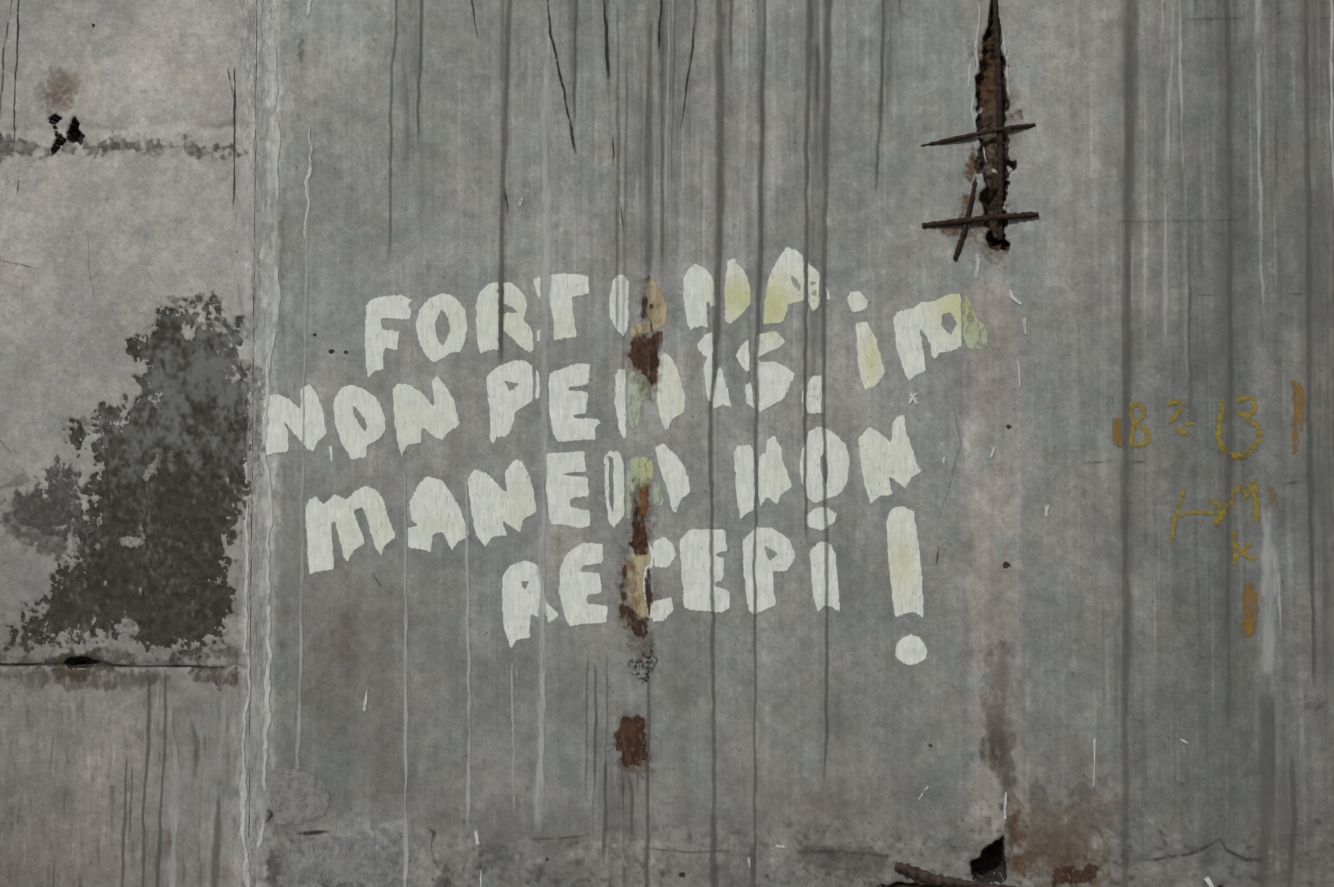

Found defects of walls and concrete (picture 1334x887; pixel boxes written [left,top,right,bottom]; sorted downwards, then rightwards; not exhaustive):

spalling [48,113,85,156]
crack [547,0,575,149]
crack [602,0,610,72]
corrosion [921,0,1038,260]
spalling [968,4,1014,174]
corrosion [628,276,662,384]
water stain [709,0,732,720]
water stain [803,0,831,548]
water stain [169,264,420,887]
corrosion [619,479,652,639]
crack [0,660,207,668]
spalling [970,836,1007,884]